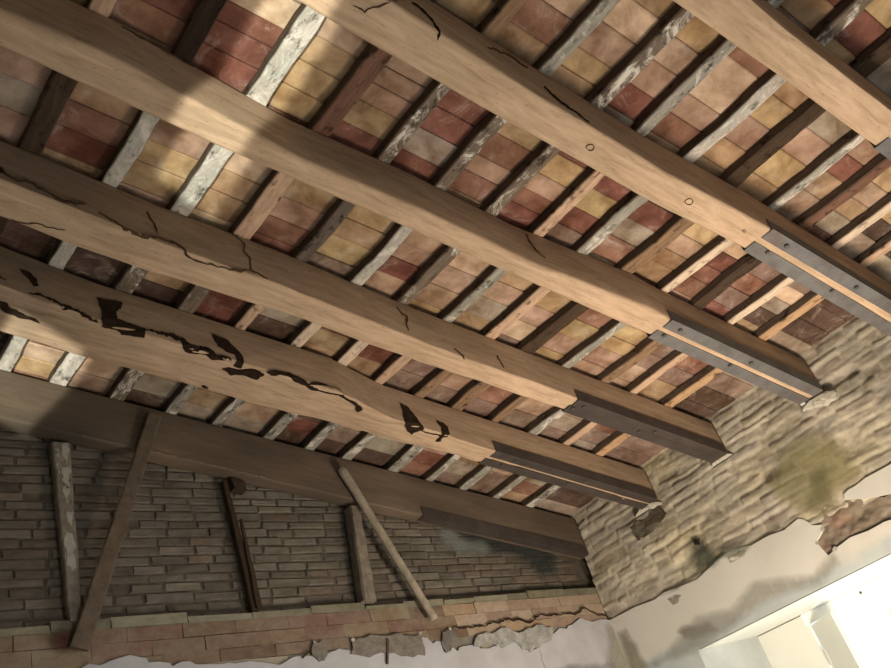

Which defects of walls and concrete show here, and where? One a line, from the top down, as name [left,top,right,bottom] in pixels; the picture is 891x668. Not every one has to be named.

crack [488,47,529,68]
crack [544,86,589,123]
crack [3,171,268,279]
crack [29,292,98,323]
crack [146,329,232,361]
flaking render [808,494,891,554]
crack [451,607,610,630]
flaking render [311,640,329,662]
flaking render [351,632,425,658]
flaking render [441,627,456,653]
flaking render [473,625,553,653]